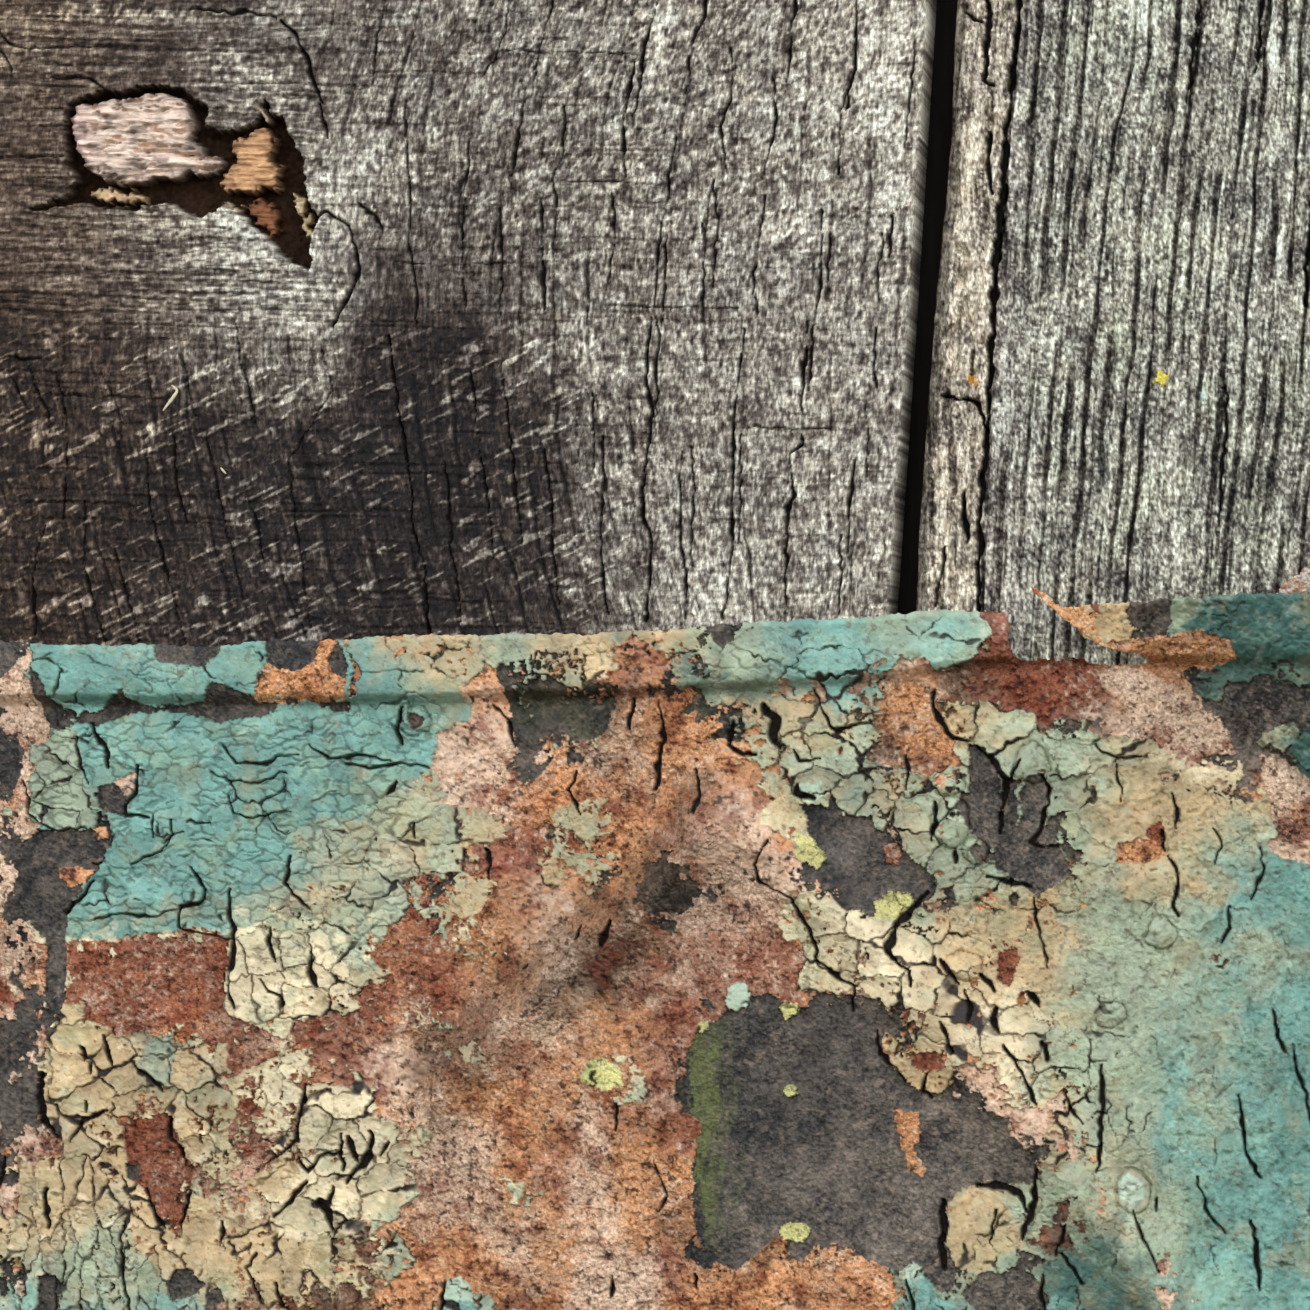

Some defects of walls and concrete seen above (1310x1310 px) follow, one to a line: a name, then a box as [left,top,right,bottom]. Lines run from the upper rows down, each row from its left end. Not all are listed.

crack [65,706,430,1015]
corrosion [491,688,722,863]
crack [728,691,872,802]
crack [931,691,1059,850]
corrosion [881,630,1237,769]
corrosion [1256,755,1310,840]
crack [36,1035,193,1310]
crack [265,1083,390,1232]
peeling [0,609,1172,1310]
corrosion [382,853,906,1310]
corrosion [894,1110,927,1178]
crack [754,840,1107,1174]